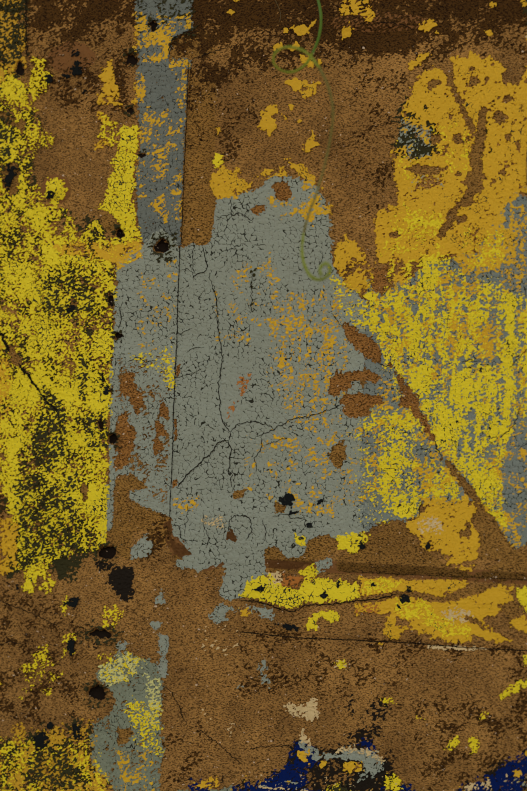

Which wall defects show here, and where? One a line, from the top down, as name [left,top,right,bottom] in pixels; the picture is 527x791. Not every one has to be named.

spalling [469,67,489,87]
spalling [407,71,514,240]
spalling [271,177,292,202]
spalling [371,265,389,296]
spalling [328,322,435,441]
spalling [109,372,190,563]
spalling [327,440,347,469]
spalling [263,456,527,604]
spalling [497,601,521,622]
crack [242,605,527,660]
spalling [115,726,134,745]